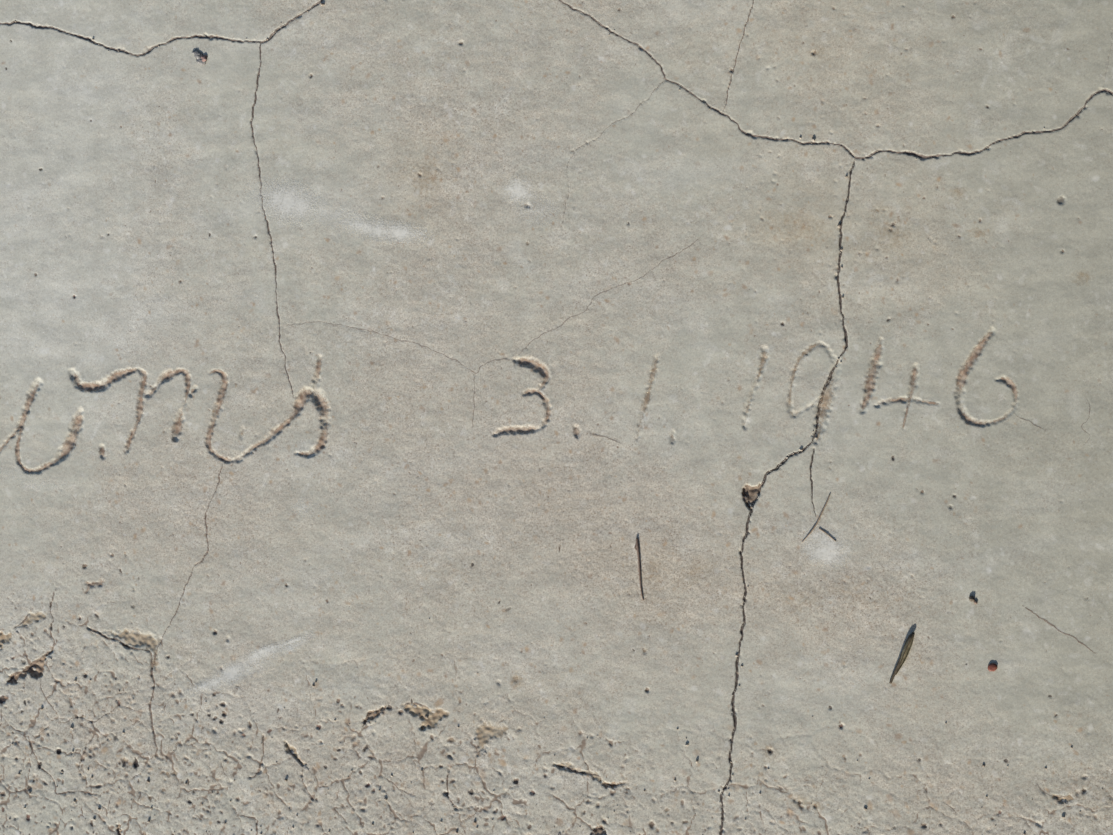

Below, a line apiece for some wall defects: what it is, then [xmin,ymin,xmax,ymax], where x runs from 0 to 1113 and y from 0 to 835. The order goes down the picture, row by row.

crack [0,0,508,424]
crack [559,0,1113,835]
spalling [0,603,65,649]
crack [0,468,222,806]
spalling [79,614,170,666]
spalling [7,652,52,684]
spalling [363,699,449,730]
spalling [285,744,309,771]
spalling [476,724,508,756]
spalling [556,763,630,790]